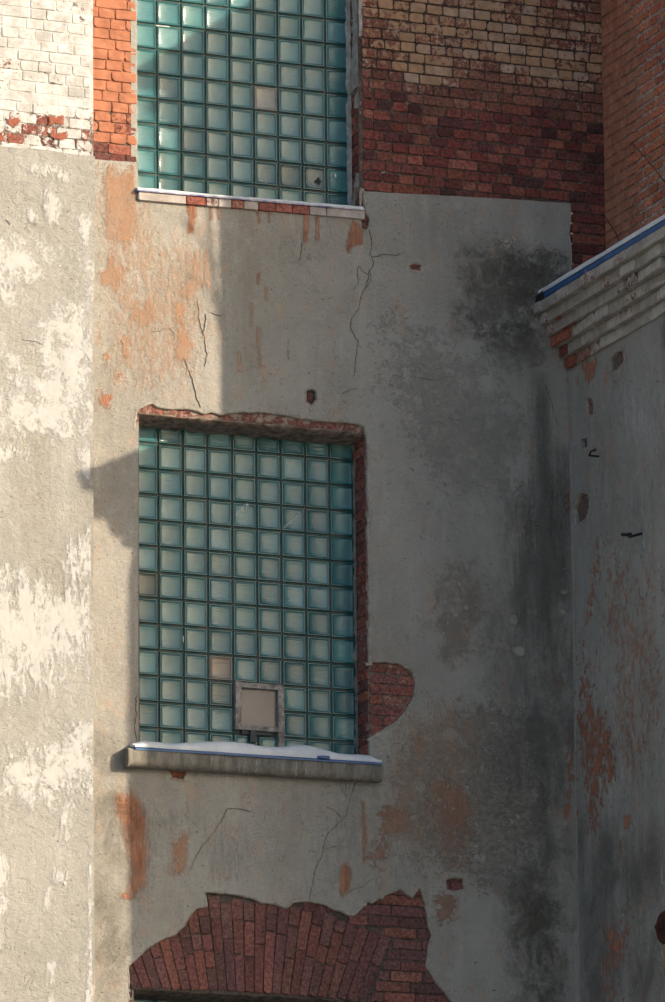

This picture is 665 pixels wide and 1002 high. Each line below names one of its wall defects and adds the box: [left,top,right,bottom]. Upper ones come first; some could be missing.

peeling [23,161,69,225]
peeling [98,164,139,247]
peeling [0,212,127,482]
crack [343,230,406,393]
damp [459,252,563,366]
peeling [0,527,91,707]
spalling [133,386,419,741]
peeling [0,721,93,845]
crack [190,808,252,871]
crack [309,781,357,900]
peeling [85,851,94,1002]
spalling [127,875,466,1002]